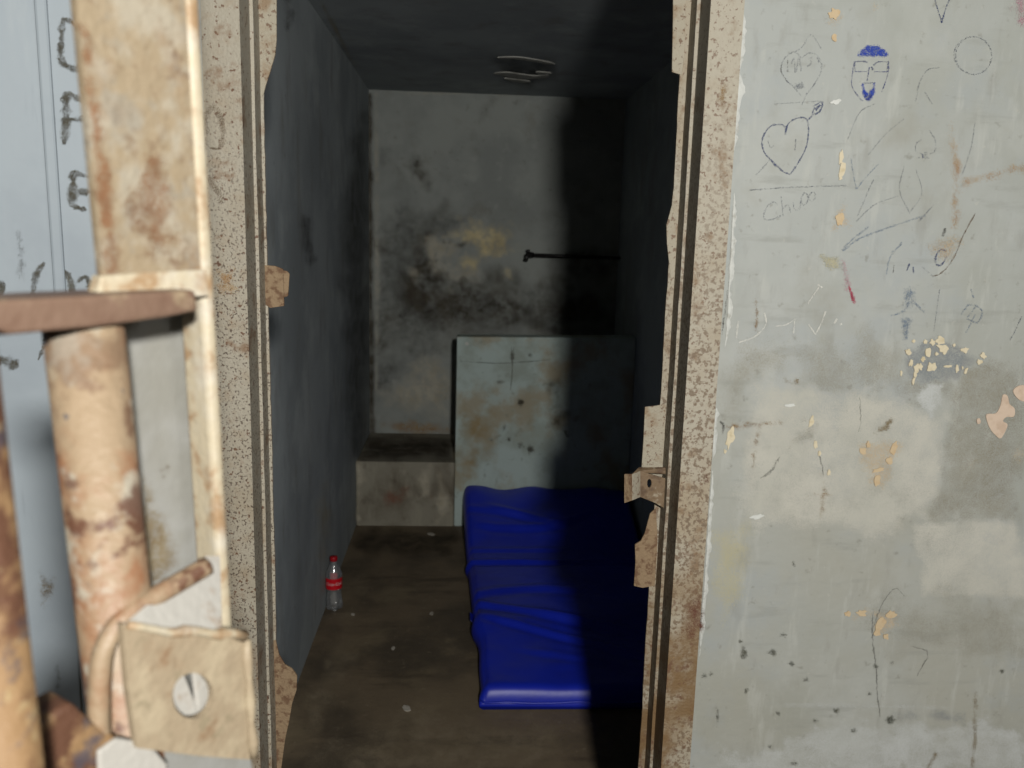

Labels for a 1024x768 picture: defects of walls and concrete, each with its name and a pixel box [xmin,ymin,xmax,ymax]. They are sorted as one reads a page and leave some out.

corrosion [71,22,181,274]
peeling [900,335,987,386]
spalling [976,385,1024,438]
corrosion [682,599,705,640]
crack [871,589,903,713]